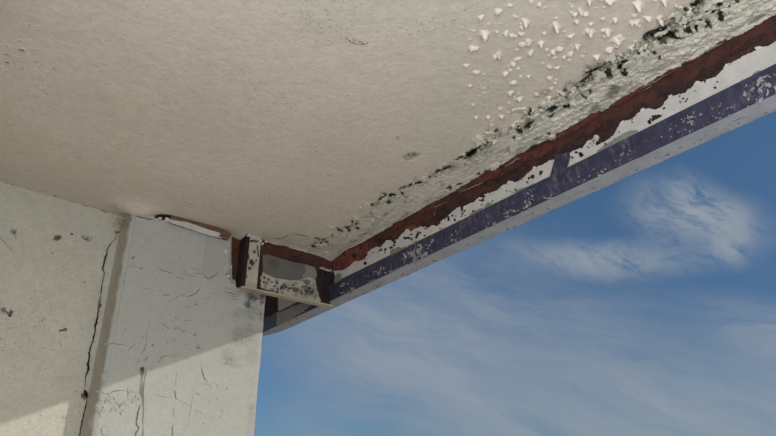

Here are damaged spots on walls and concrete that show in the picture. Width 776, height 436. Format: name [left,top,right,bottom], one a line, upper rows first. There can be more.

corrosion [696,26,765,79]
flaking render [309,0,776,300]
corrosion [455,35,739,207]
spalling [223,234,268,286]
corrosion [333,200,447,271]
crack [78,215,221,436]
peeling [276,298,320,326]